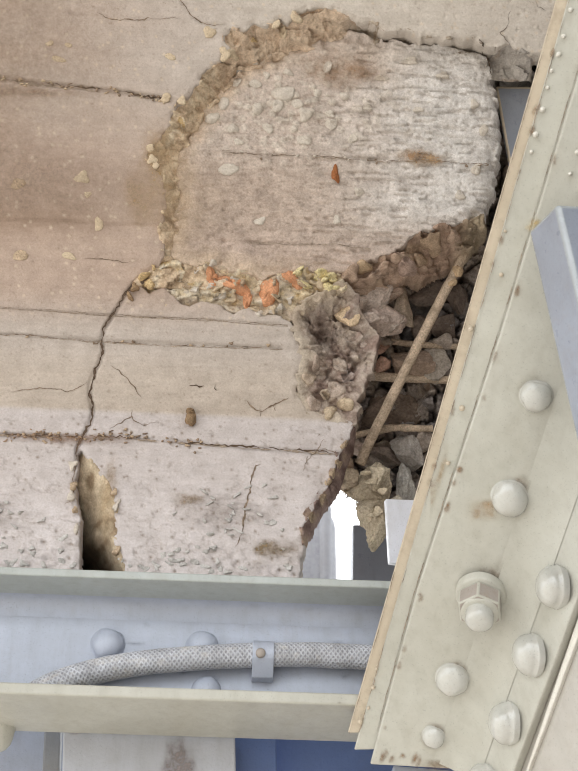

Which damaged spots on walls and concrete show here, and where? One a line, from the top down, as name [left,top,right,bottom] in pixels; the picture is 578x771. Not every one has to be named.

crack [99,0,215,26]
spalling [95,8,533,547]
crack [14,258,155,571]
peeling [4,545,47,568]
peeling [117,485,284,574]
crack [237,464,260,545]